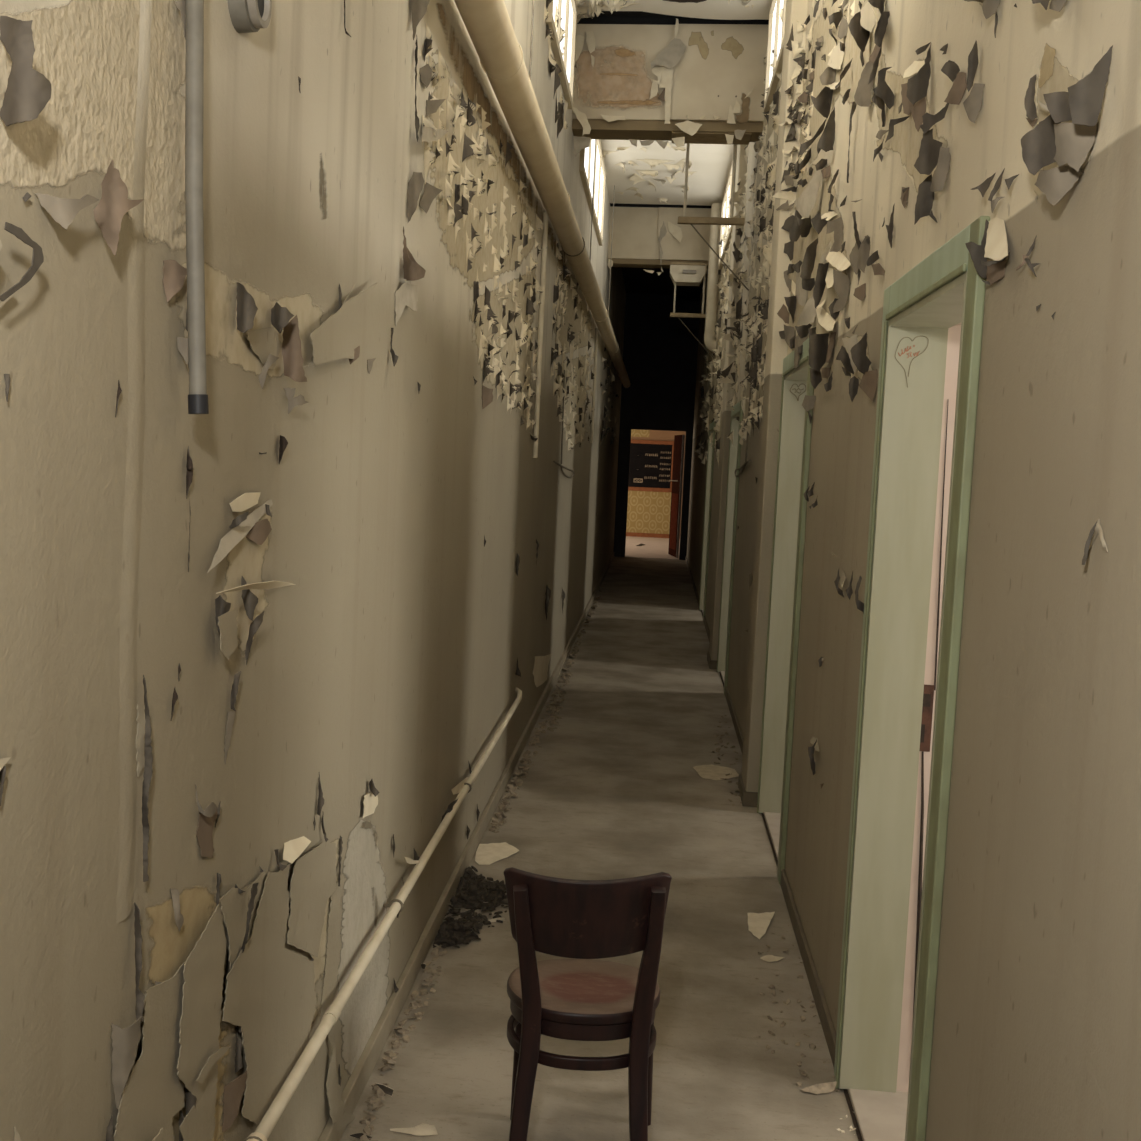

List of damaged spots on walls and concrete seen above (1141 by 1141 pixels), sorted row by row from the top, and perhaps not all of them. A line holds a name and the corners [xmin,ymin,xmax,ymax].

peeling [964,0,1000,38]
peeling [1032,0,1068,12]
peeling [0,0,188,365]
peeling [204,263,377,414]
peeling [390,0,619,451]
peeling [543,0,985,466]
peeling [965,45,1113,285]
peeling [804,482,818,509]
peeling [207,492,296,765]
peeling [0,757,11,806]
peeling [441,761,472,822]
peeling [106,774,420,1141]